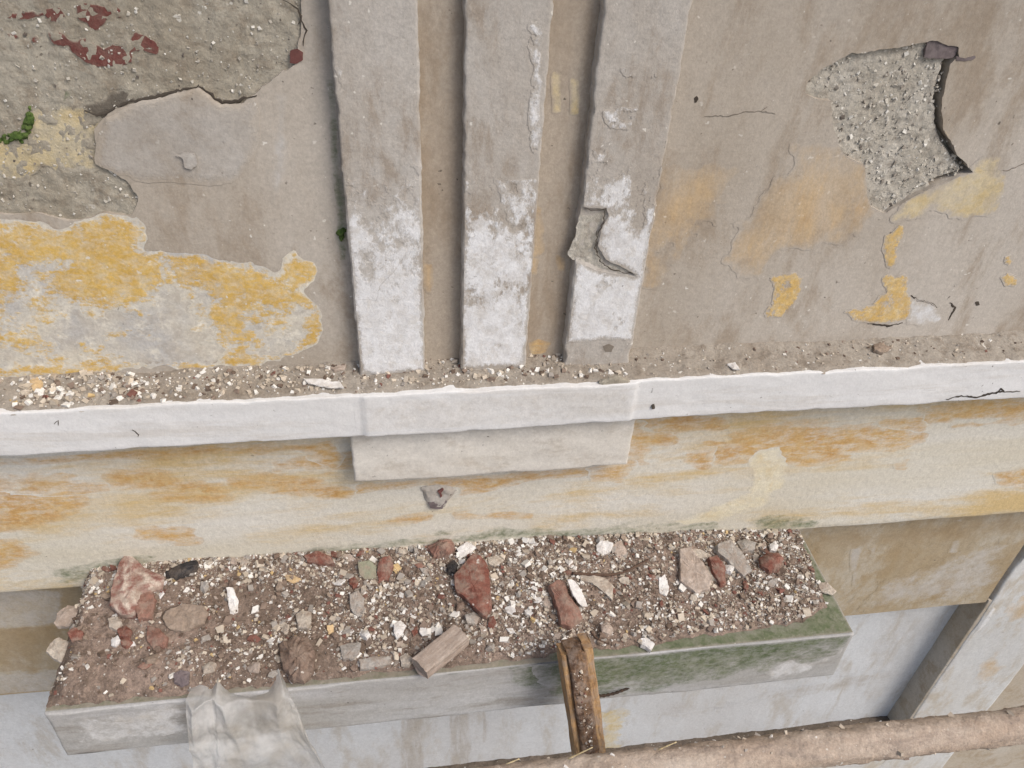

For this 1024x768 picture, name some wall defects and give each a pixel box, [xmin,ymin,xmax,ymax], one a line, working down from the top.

crack [84,85,257,117]
crack [705,107,775,117]
flaking render [805,40,976,211]
peeling [0,0,324,378]
peeling [568,144,662,352]
peeling [763,272,804,318]
peeling [844,225,914,324]
crack [946,388,1020,400]
leakage [665,447,788,533]